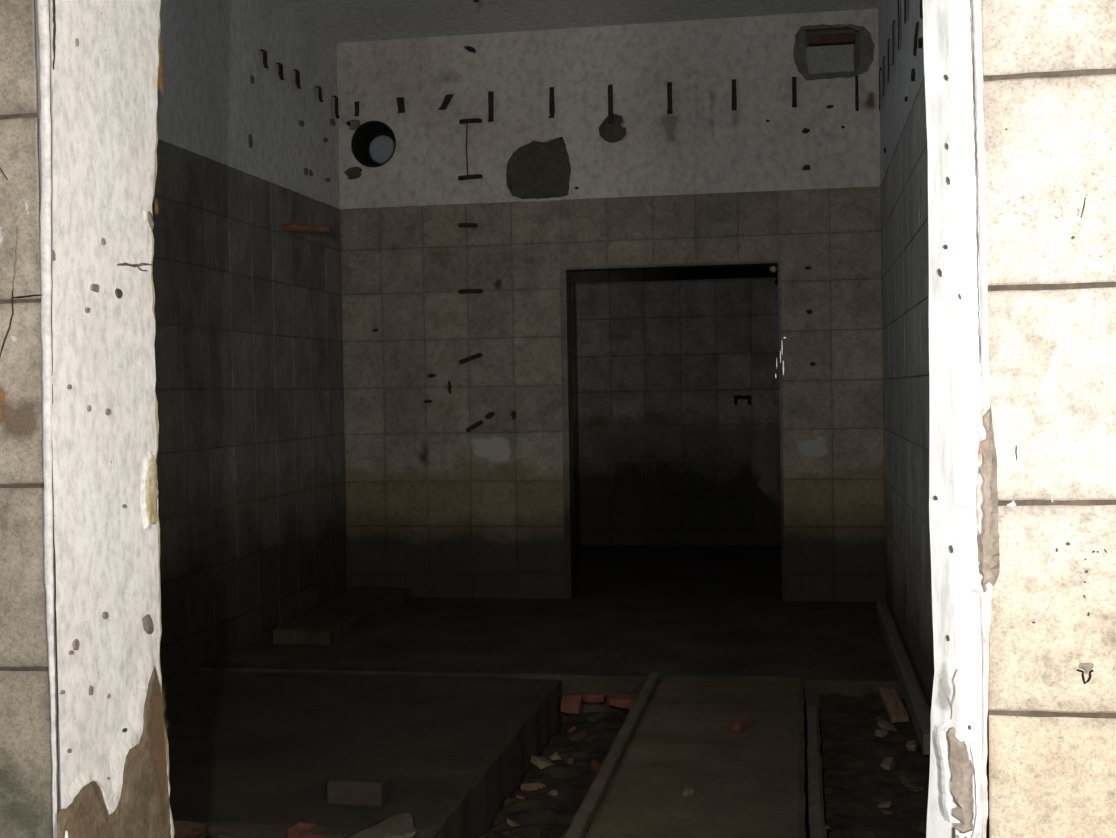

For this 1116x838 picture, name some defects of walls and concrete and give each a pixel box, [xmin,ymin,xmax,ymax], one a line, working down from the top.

spalling [143,113,158,334]
flaking render [505,135,574,202]
crack [0,226,41,357]
corrosion [0,389,36,436]
peeling [949,377,1016,596]
peeling [57,392,174,838]
peeling [932,720,988,838]